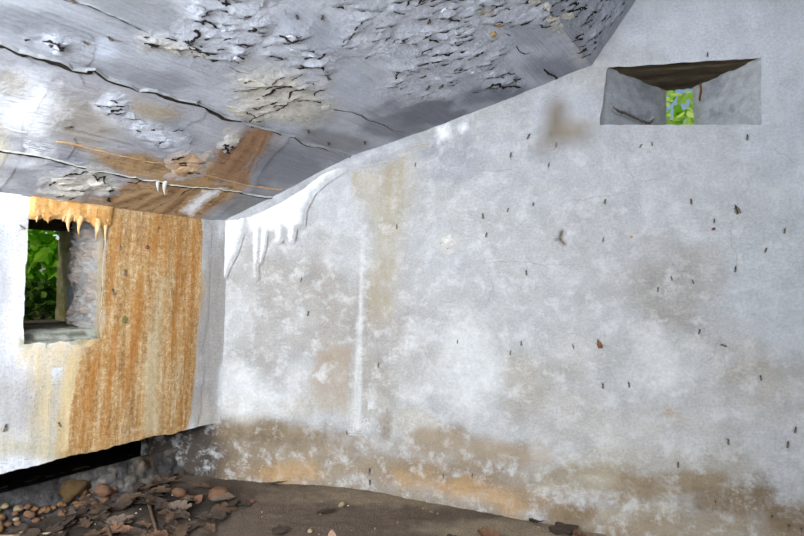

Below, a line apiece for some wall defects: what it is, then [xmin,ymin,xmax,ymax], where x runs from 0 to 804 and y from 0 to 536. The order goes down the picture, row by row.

spalling [14,22,96,68]
crack [64,0,149,34]
crack [0,40,351,158]
crack [312,102,409,135]
spalling [88,0,636,181]
crack [0,149,273,199]
rust [9,121,290,466]
water stain [203,114,596,532]
water stain [602,452,804,536]